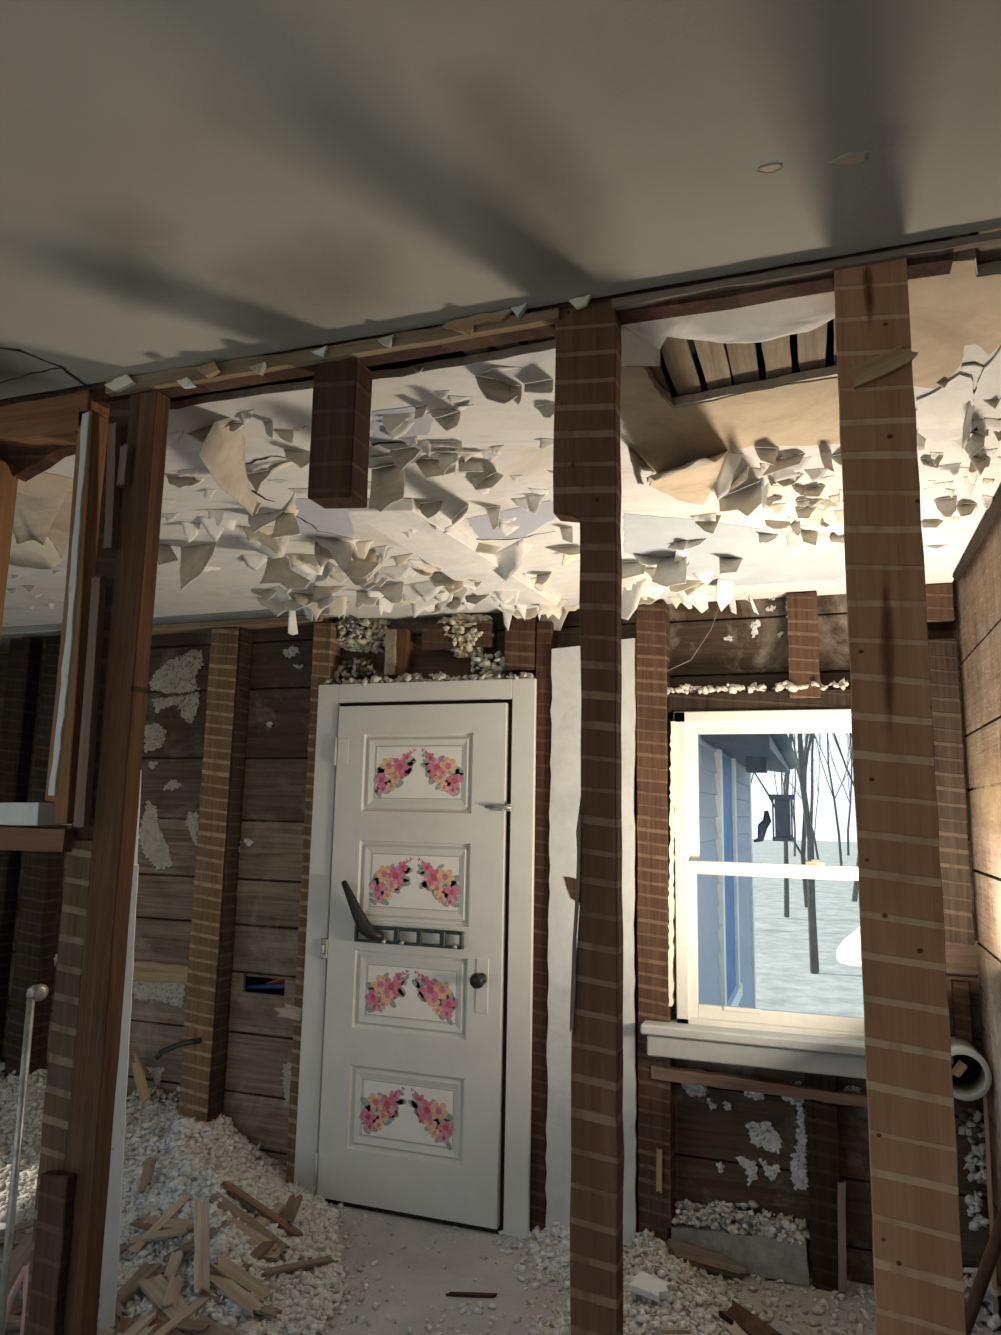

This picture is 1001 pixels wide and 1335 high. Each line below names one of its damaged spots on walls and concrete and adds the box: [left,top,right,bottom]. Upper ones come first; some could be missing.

peeling [569,294,592,310]
crack [0,347,93,398]
peeling [105,374,136,392]
peeling [908,228,1001,528]
peeling [158,303,580,670]
peeling [620,291,844,638]
peeling [7,472,73,610]
peeling [144,649,205,769]
peeling [163,779,182,791]
peeling [138,801,173,870]
peeling [185,811,199,846]